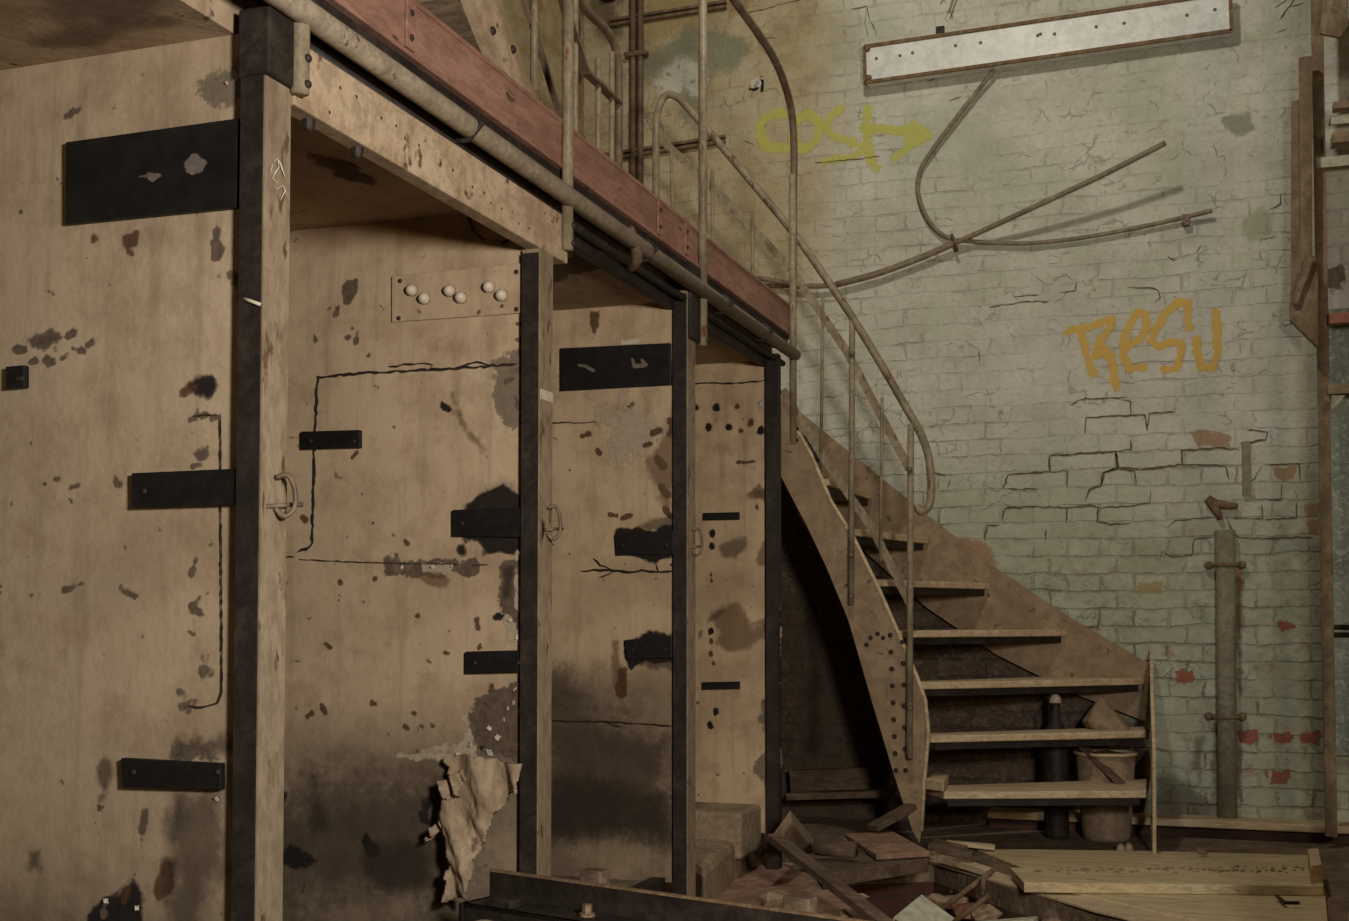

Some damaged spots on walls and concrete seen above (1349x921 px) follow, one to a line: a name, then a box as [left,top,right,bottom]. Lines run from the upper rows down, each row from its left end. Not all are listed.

crack [582,558,673,578]
crack [984,397,1311,572]
flaking render [419,678,522,903]